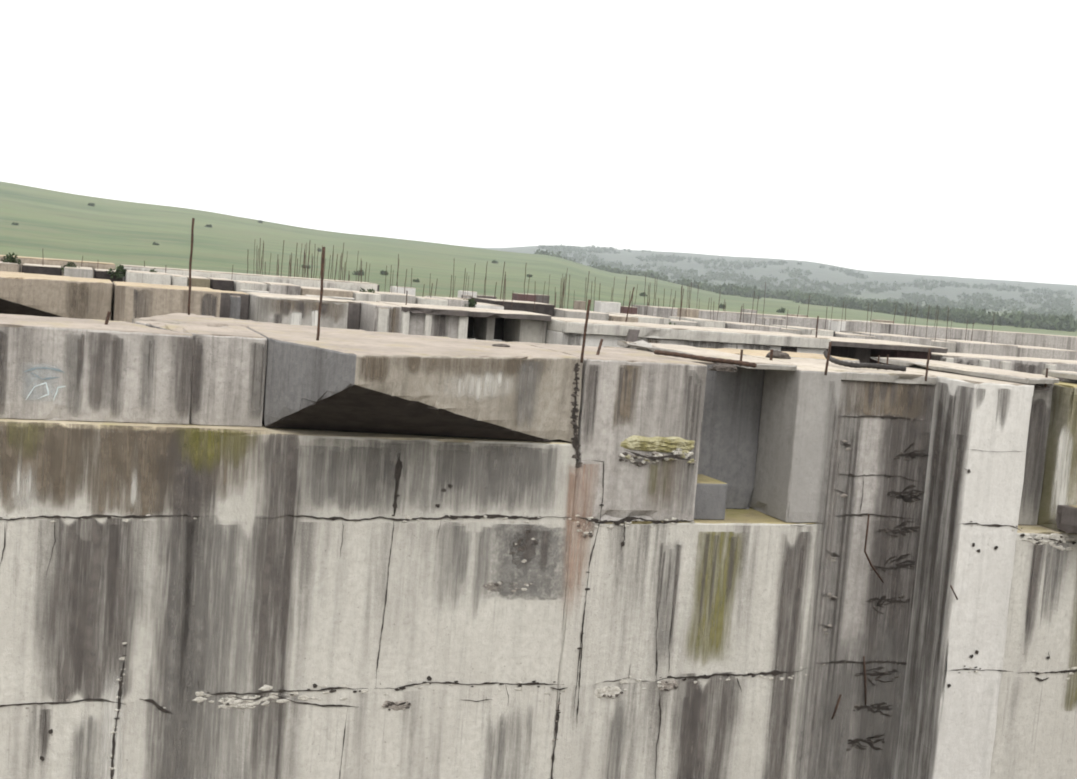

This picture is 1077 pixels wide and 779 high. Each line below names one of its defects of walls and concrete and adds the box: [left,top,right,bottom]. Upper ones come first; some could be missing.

leakage [0,331,299,779]
leakage [313,440,541,508]
crack [0,363,907,779]
spalling [482,581,532,592]
leakage [477,524,563,600]
leakage [658,545,681,638]
crack [793,415,929,614]
leakage [765,381,983,779]
crack [956,521,1077,551]
spalling [217,695,278,710]
leakage [679,672,735,779]
crack [944,652,1077,681]